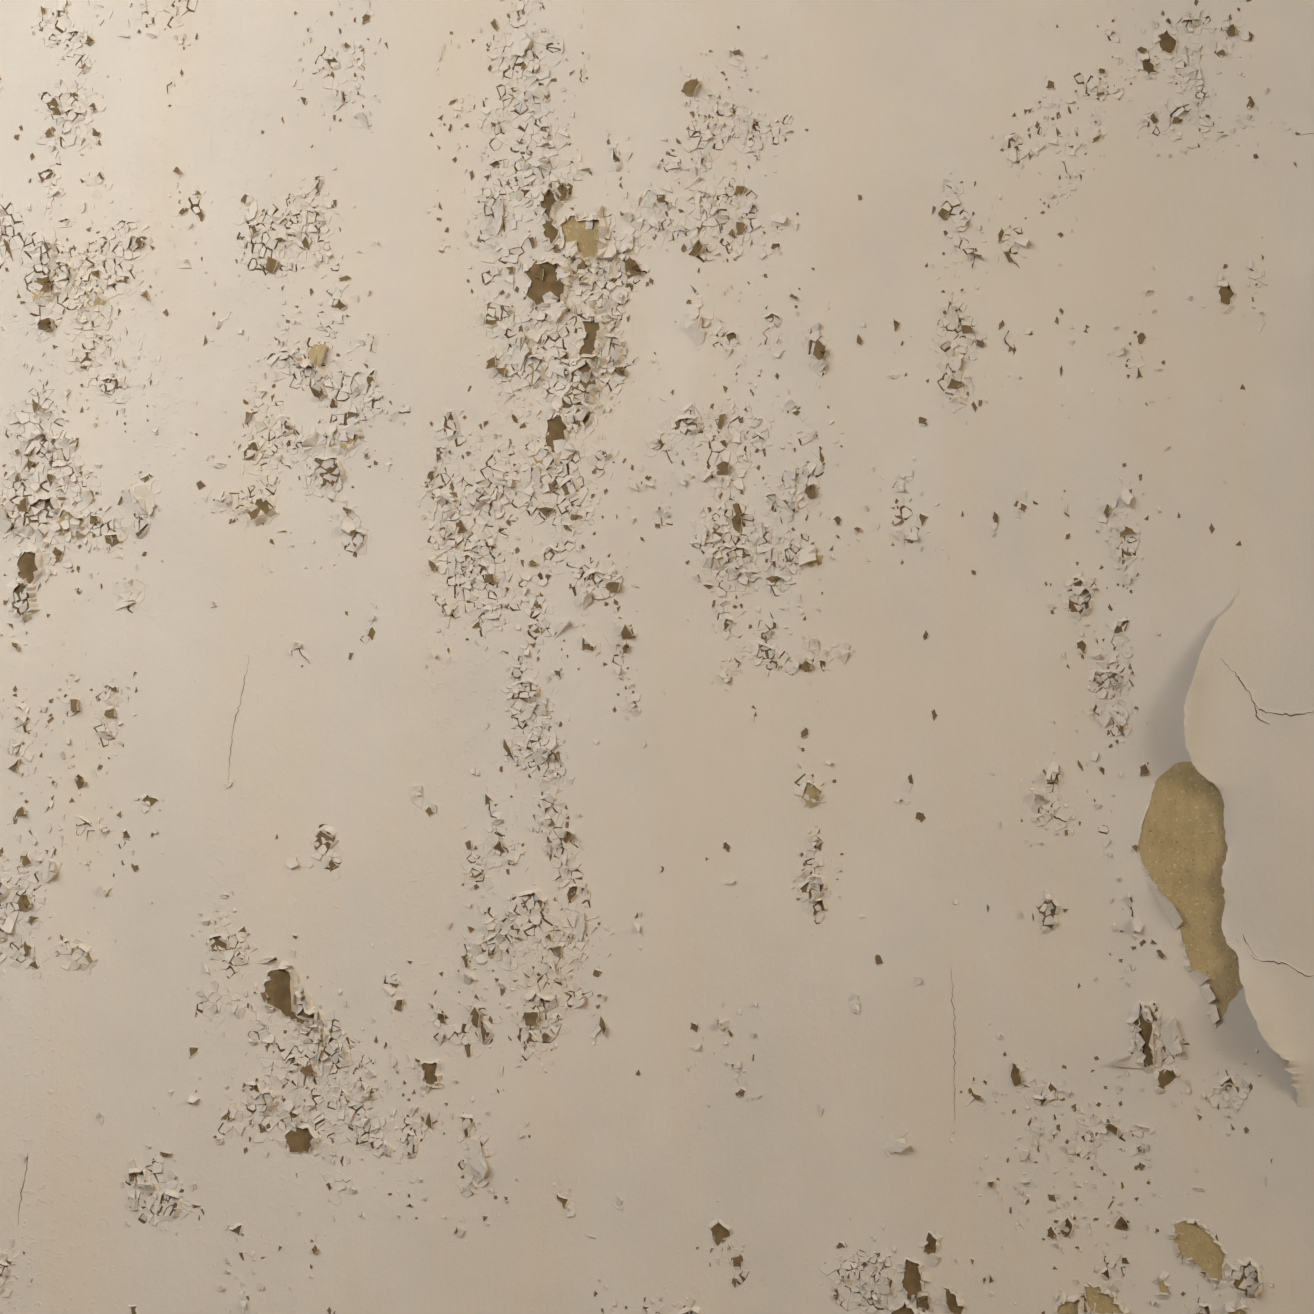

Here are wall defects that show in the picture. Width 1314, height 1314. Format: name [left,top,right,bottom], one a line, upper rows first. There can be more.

peeling [168,164,216,287]
peeling [924,0,1268,425]
peeling [0,0,199,659]
peeling [864,456,950,565]
peeling [186,0,861,1277]
peeling [0,668,140,983]
peeling [134,793,164,813]
peeling [894,773,927,823]
peeling [959,463,1314,1314]
peeling [121,1145,205,1237]
peeling [218,1223,282,1314]
peeling [819,1225,994,1314]